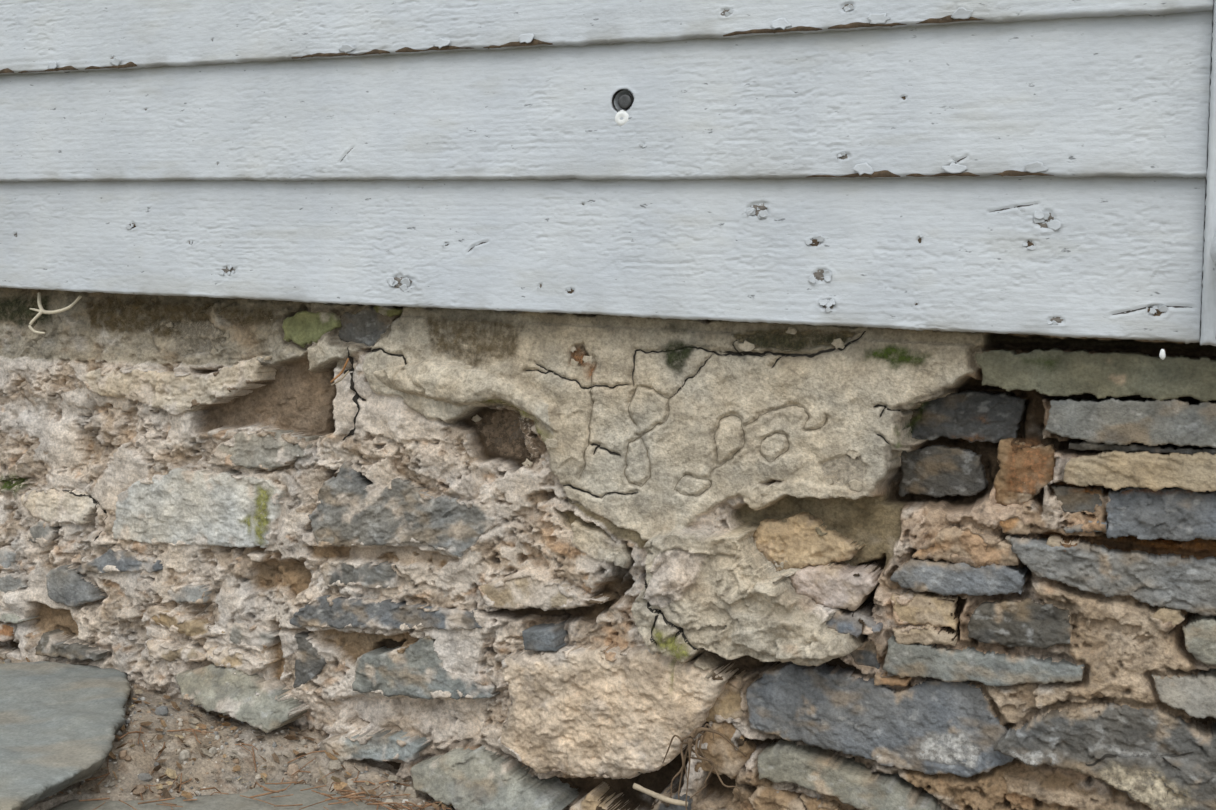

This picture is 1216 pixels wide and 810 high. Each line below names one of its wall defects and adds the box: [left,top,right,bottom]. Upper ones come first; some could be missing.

peeling [806,152,1054,178]
peeling [745,203,769,219]
peeling [1033,211,1061,231]
peeling [805,235,824,246]
peeling [387,277,412,291]
peeling [809,269,832,284]
peeling [1147,304,1169,316]
crack [526,331,866,398]